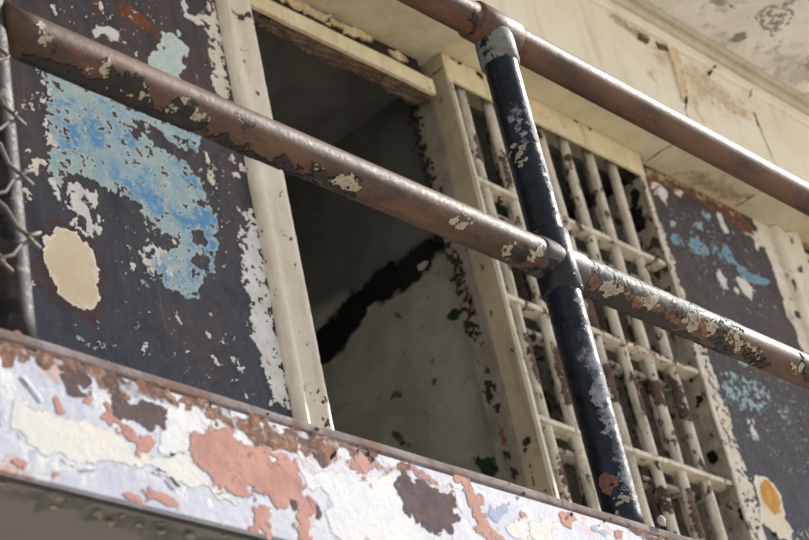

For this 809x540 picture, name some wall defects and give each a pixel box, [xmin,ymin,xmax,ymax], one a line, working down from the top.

peeling [91,2,121,42]
peeling [148,29,189,78]
peeling [181,0,232,99]
peeling [17,53,363,311]
peeling [650,182,683,206]
peeling [236,206,291,410]
peeling [101,401,156,459]
rust [0,330,387,468]
peeling [208,354,248,399]
peeling [570,209,809,540]
peeling [189,421,317,540]
peeling [453,473,505,540]